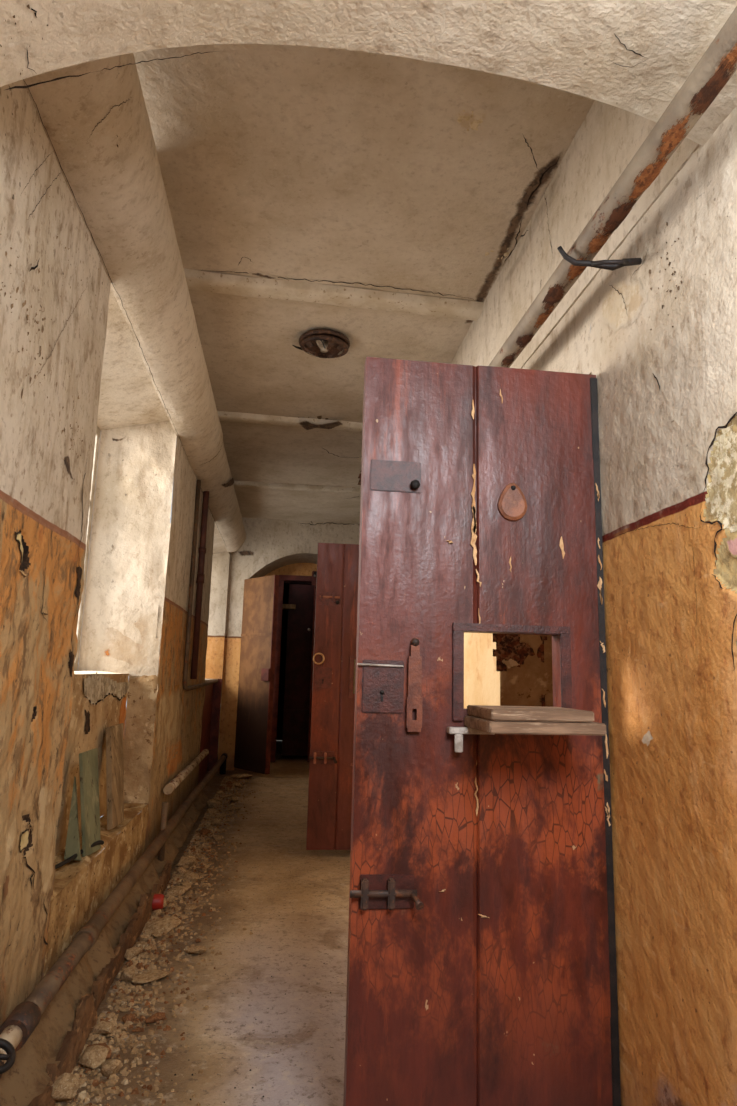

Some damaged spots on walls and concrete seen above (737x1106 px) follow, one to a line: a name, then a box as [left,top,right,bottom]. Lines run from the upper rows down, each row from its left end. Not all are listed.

crack [6,50,222,474]
rust [501,41,737,367]
flaking render [700,412,737,593]